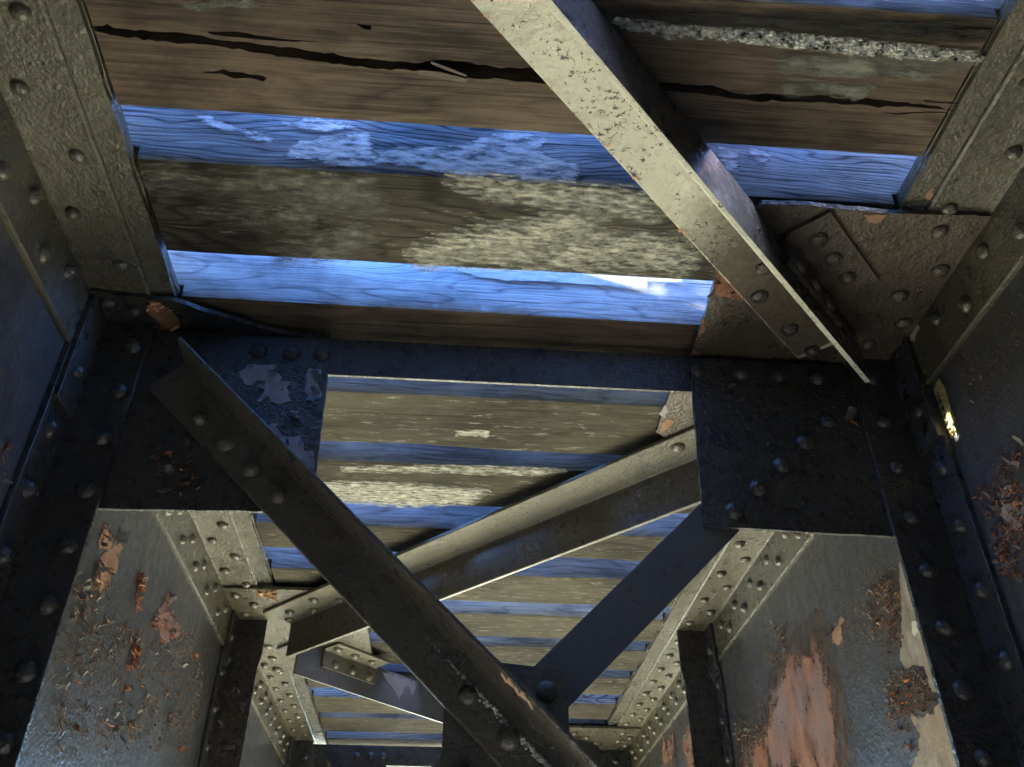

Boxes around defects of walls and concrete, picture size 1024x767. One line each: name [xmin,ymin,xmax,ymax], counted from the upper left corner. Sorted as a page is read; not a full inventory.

damp [141,115,831,357]
spalling [238,364,323,471]
rust [150,590,182,645]
rust [733,621,854,767]